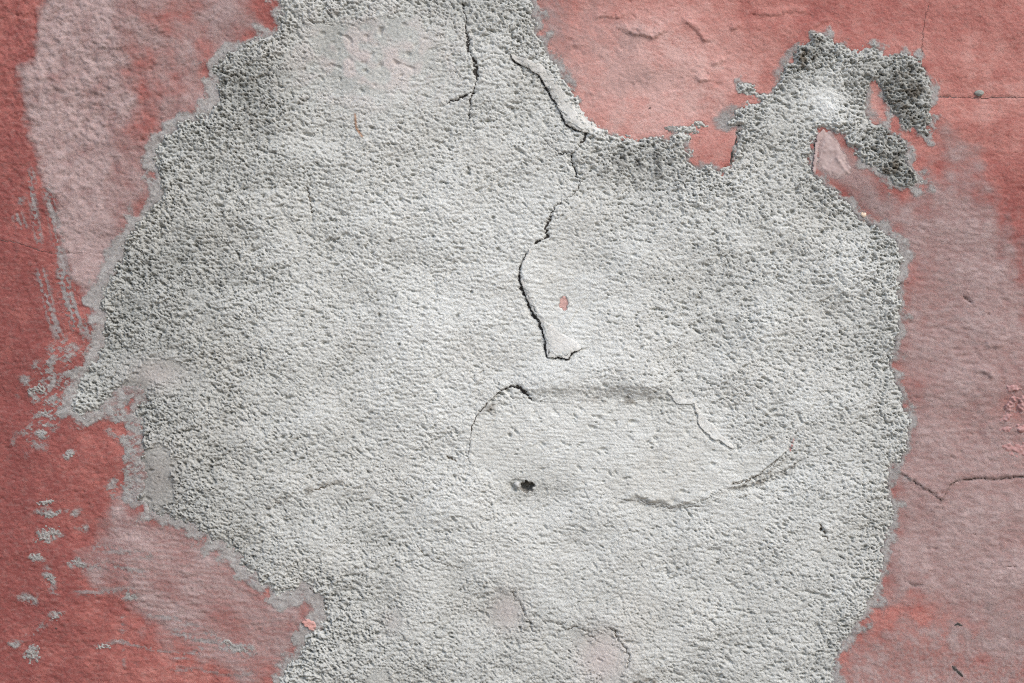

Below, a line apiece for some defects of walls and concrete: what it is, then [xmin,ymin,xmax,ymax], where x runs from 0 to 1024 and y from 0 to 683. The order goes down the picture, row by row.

crack [447,3,479,120]
peeling [511,54,602,133]
crack [511,56,587,361]
peeling [812,129,851,179]
peeling [520,248,581,359]
crack [447,385,532,462]
spalling [470,387,787,507]